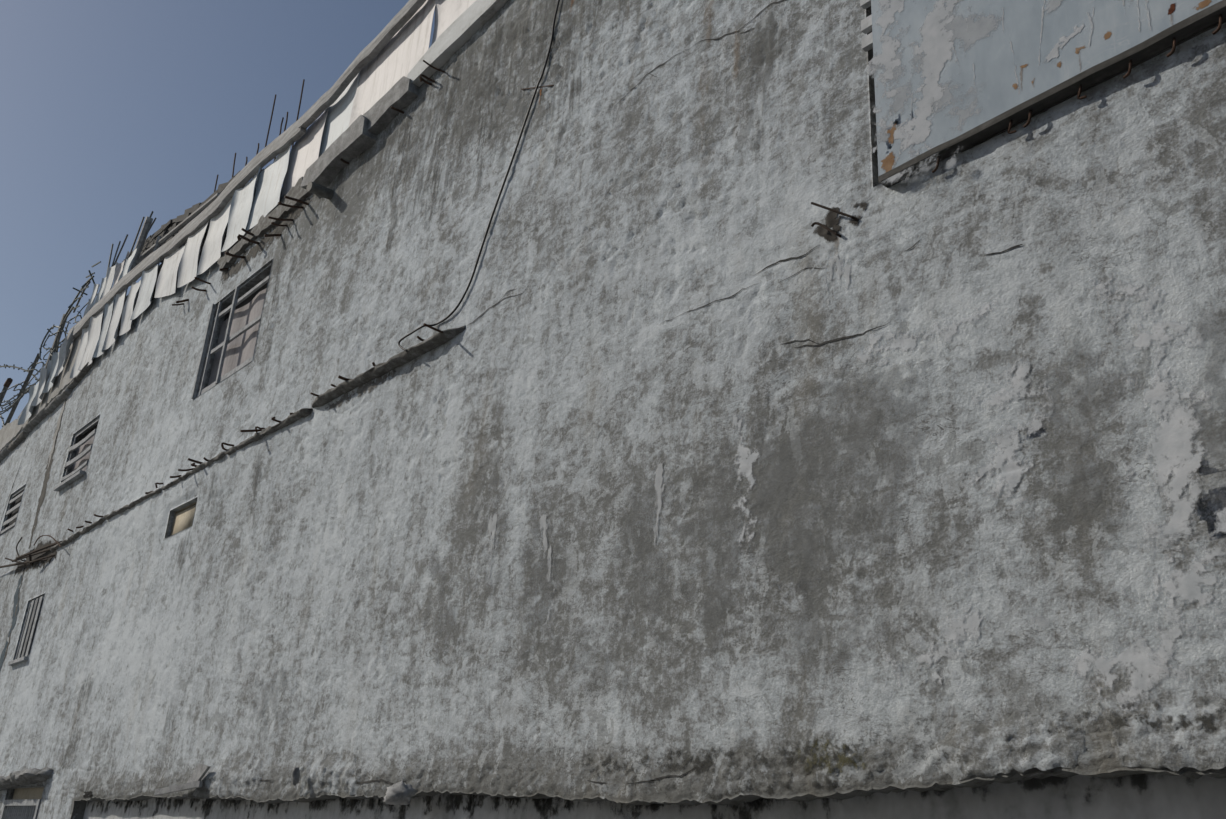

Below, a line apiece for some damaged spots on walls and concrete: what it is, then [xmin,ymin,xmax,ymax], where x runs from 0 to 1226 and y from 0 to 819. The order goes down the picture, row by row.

crack [618,0,785,103]
peeling [865,0,959,182]
spalling [219,198,312,284]
crack [662,245,823,323]
crack [780,322,890,348]
damp [654,463,664,543]
damp [540,514,554,591]
damp [1047,699,1226,733]
damp [87,797,289,819]
damp [309,797,409,819]
damp [423,794,579,819]
damp [583,738,867,819]